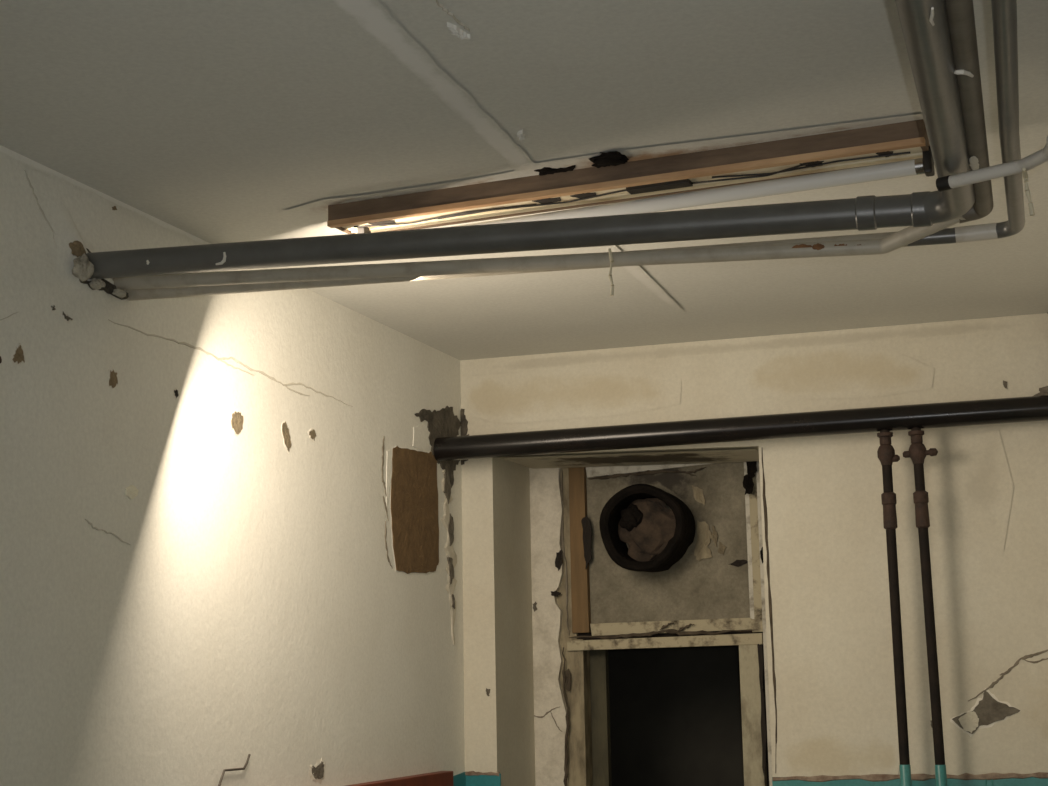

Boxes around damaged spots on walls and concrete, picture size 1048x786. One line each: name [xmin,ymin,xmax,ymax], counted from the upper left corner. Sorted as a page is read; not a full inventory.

spalling [69,241,129,300]
crack [108,319,353,407]
spalling [230,409,243,436]
spalling [281,421,292,454]
flaking render [386,406,469,645]
crack [968,650,1048,701]
spalling [950,688,1021,737]
spalling [309,756,326,784]